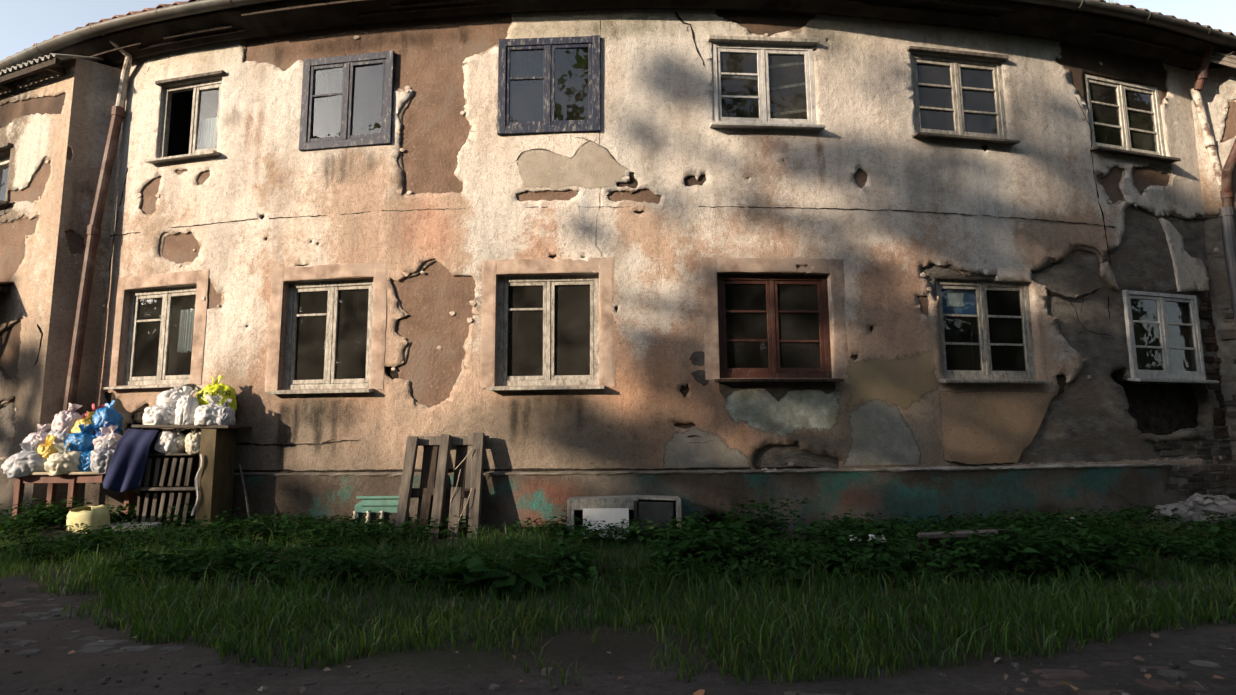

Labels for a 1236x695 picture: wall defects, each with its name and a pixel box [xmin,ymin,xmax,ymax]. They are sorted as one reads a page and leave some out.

crack [675,11,705,67]
flaking render [0,93,66,128]
flaking render [241,14,512,198]
flaking render [1055,43,1167,111]
flaking render [0,157,51,286]
flaking render [136,176,162,215]
flaking render [159,229,202,267]
flaking render [516,190,579,202]
flaking render [607,173,661,214]
flaking render [386,259,476,408]
flaking render [1018,163,1236,502]
peeling [725,388,841,470]